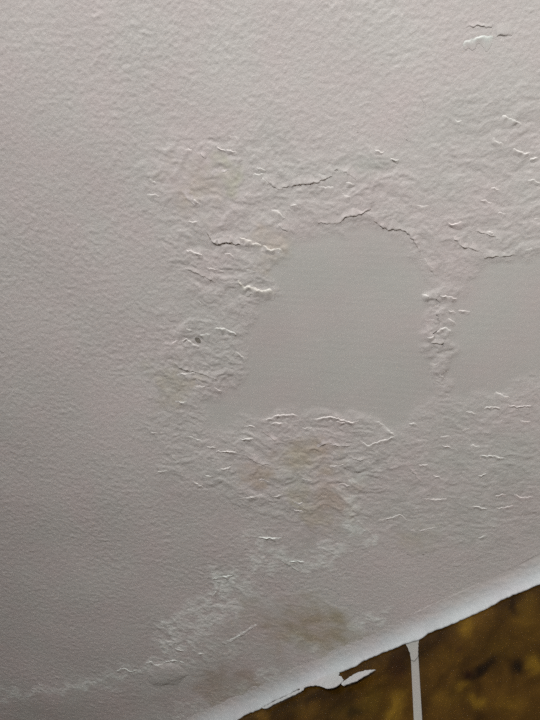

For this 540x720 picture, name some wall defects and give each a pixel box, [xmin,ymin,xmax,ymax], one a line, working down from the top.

peeling [187,57,540,547]
leakage [0,430,445,720]
peeling [341,670,375,686]